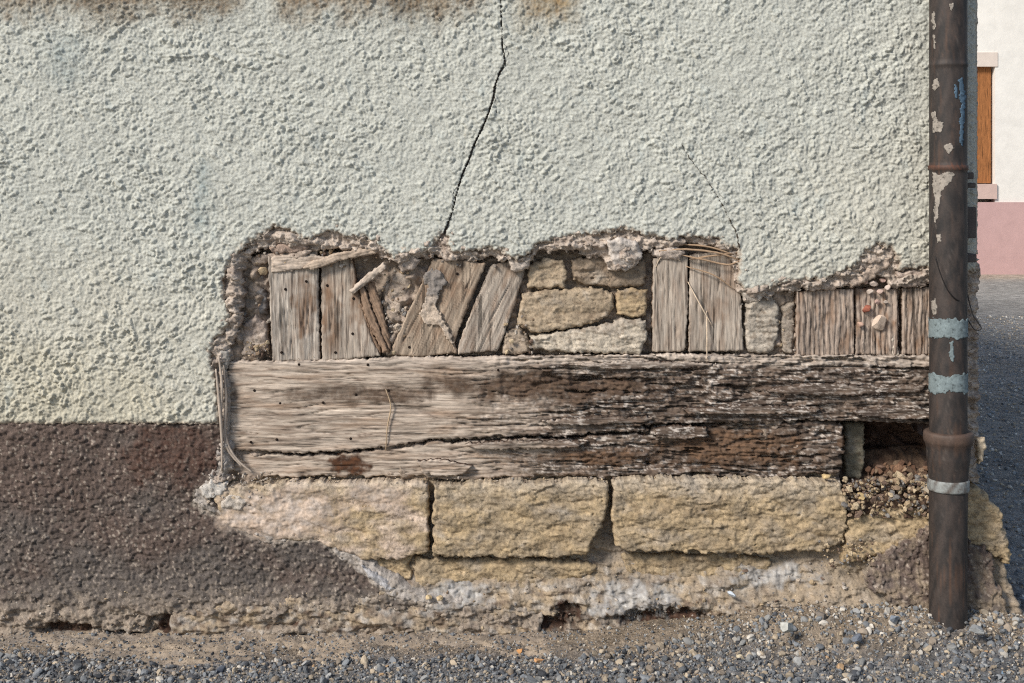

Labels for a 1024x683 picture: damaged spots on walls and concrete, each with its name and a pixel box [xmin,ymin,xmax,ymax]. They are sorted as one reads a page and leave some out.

crack [444,0,509,234]
spalling [193,224,929,516]
spalling [968,263,981,482]
spalling [331,547,470,606]
efflorescence [430,581,485,610]
efflorescence [587,579,679,620]